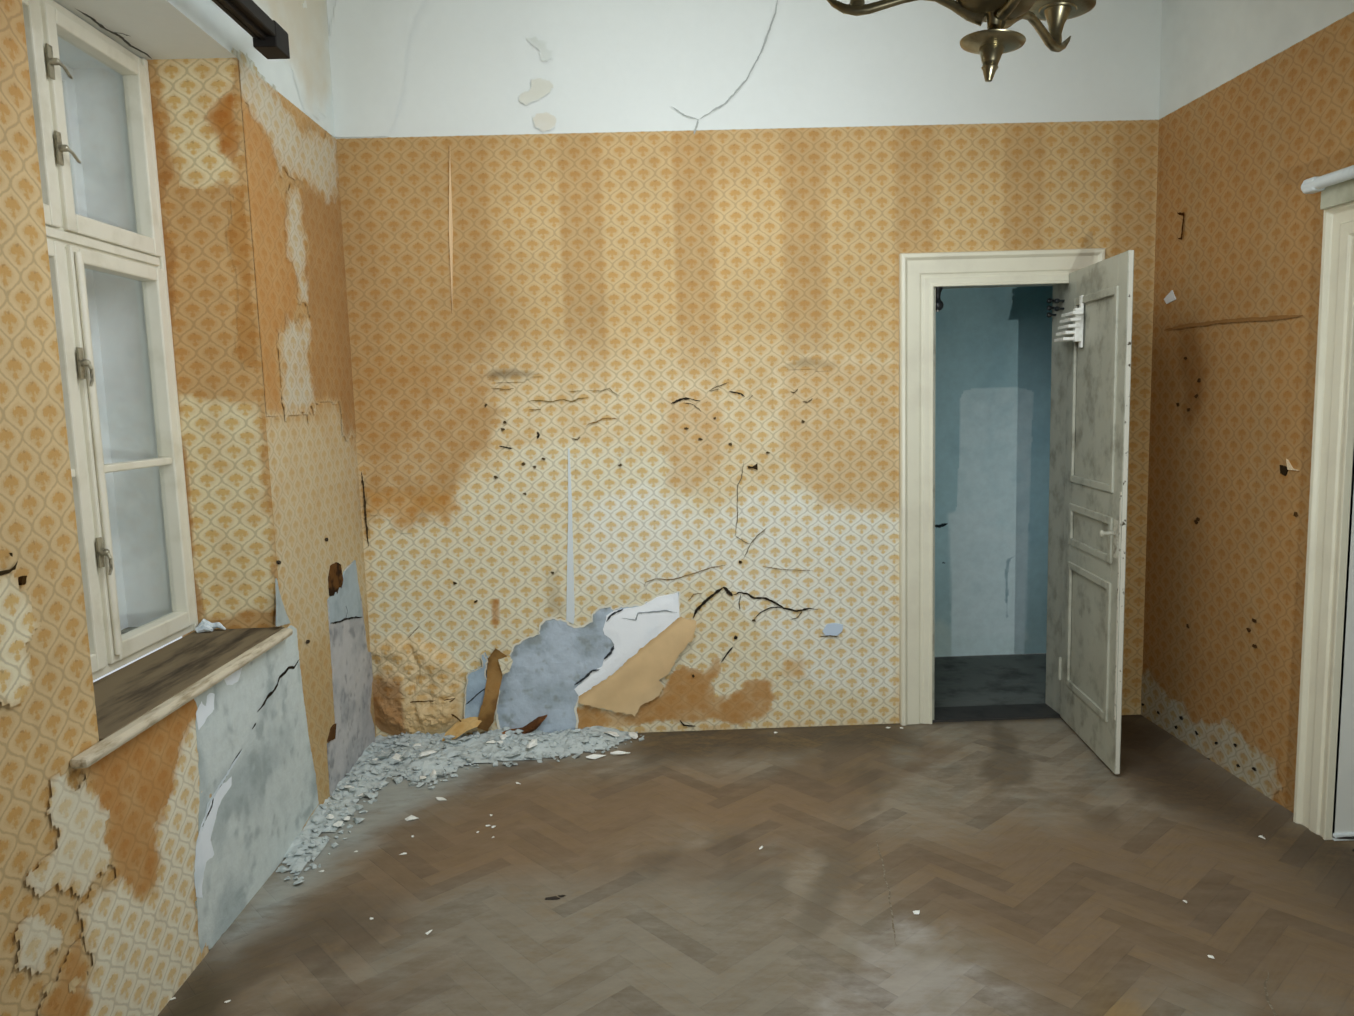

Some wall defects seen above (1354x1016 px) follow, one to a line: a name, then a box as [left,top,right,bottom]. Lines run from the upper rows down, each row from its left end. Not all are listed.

crack [673,3,777,134]
damp [150,58,899,735]
crack [644,464,818,619]
crack [202,660,299,827]
flaking render [194,560,376,954]
flaking render [464,591,681,733]
damp [38,699,212,1016]